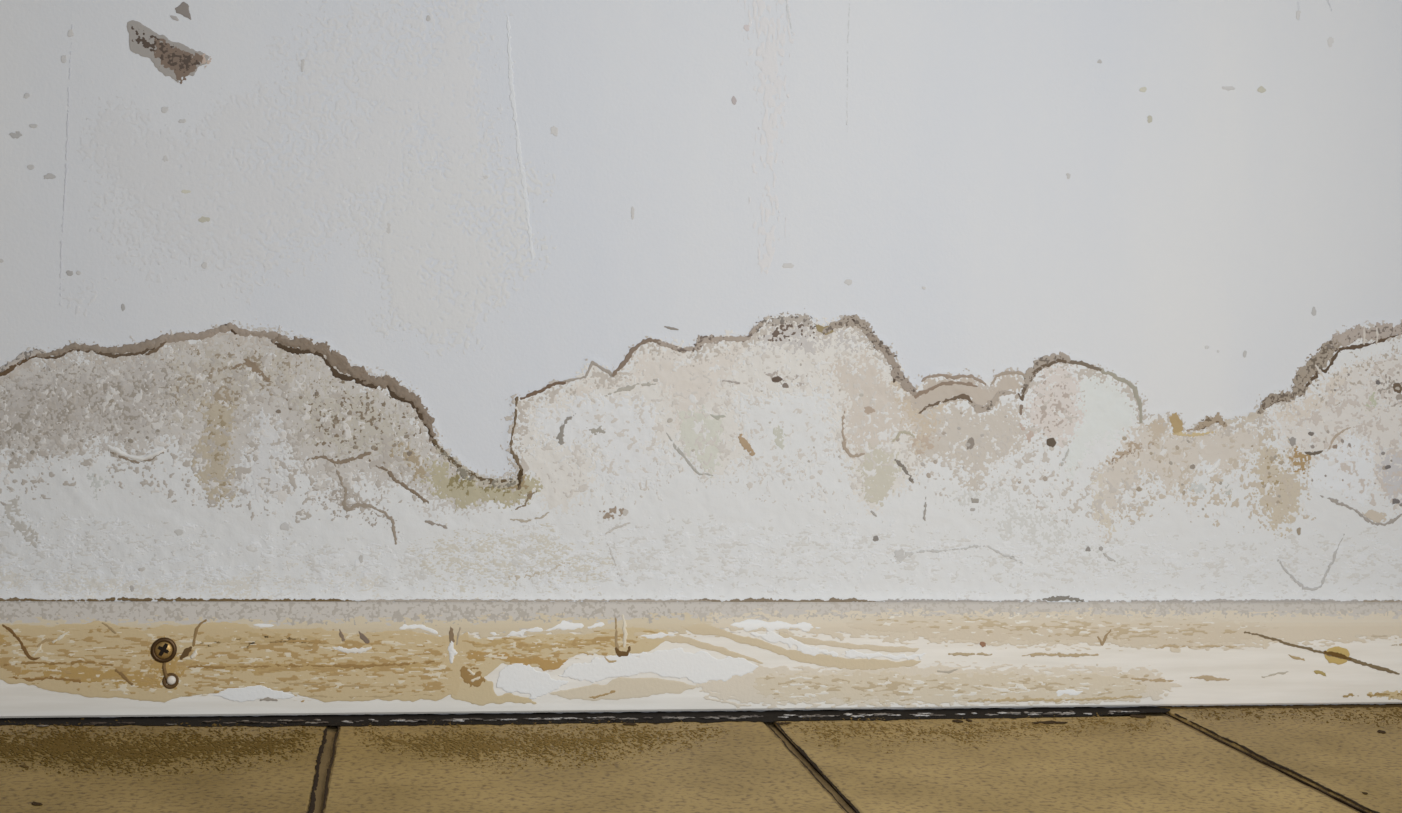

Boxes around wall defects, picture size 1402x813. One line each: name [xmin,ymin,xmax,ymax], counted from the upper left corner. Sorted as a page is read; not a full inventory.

spalling [127,20,209,84]
spalling [170,2,191,21]
crack [0,342,166,376]
leakage [0,0,1402,642]
spalling [0,349,438,518]
crack [307,447,447,545]
crack [225,324,679,523]
crack [0,495,1402,602]
crack [841,354,1143,564]
peeling [917,347,1402,540]
crack [1305,427,1355,456]
leakage [0,626,658,702]